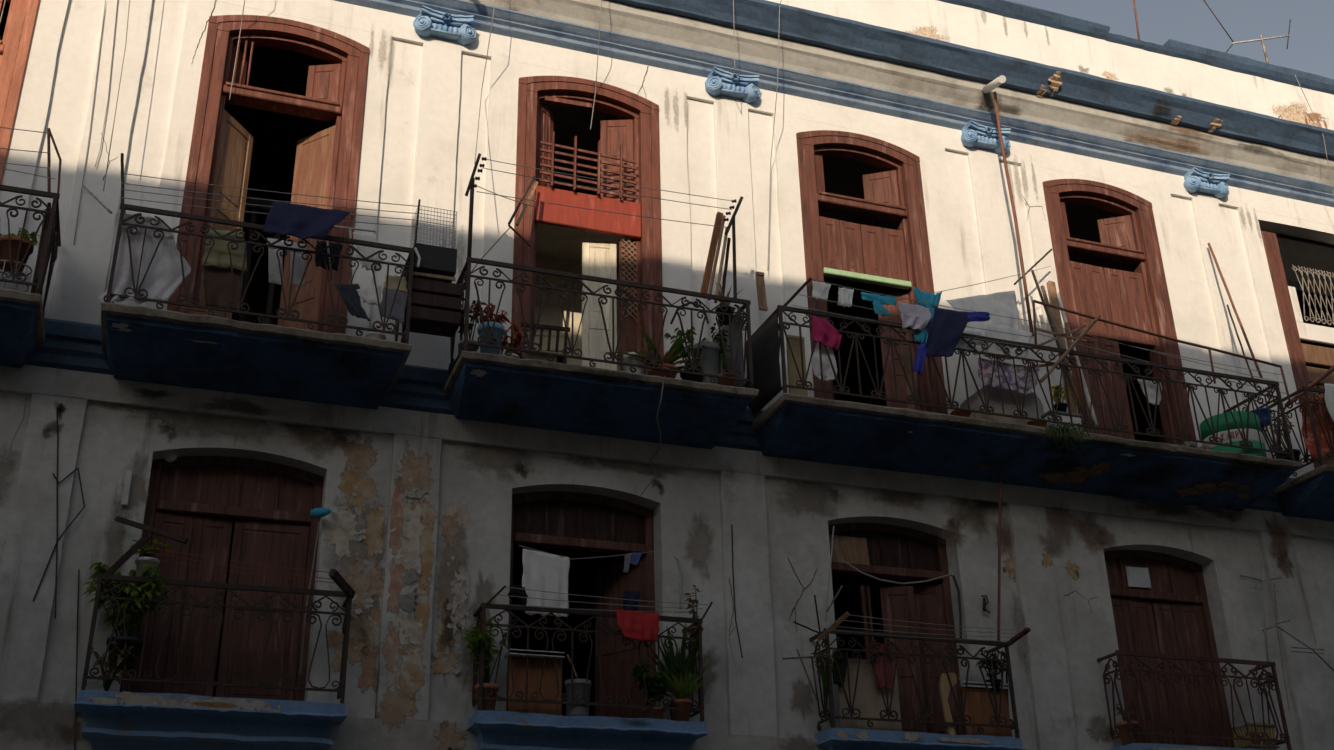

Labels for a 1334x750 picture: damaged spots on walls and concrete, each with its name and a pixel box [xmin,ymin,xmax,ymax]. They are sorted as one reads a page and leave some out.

peeling [321,437,470,732]